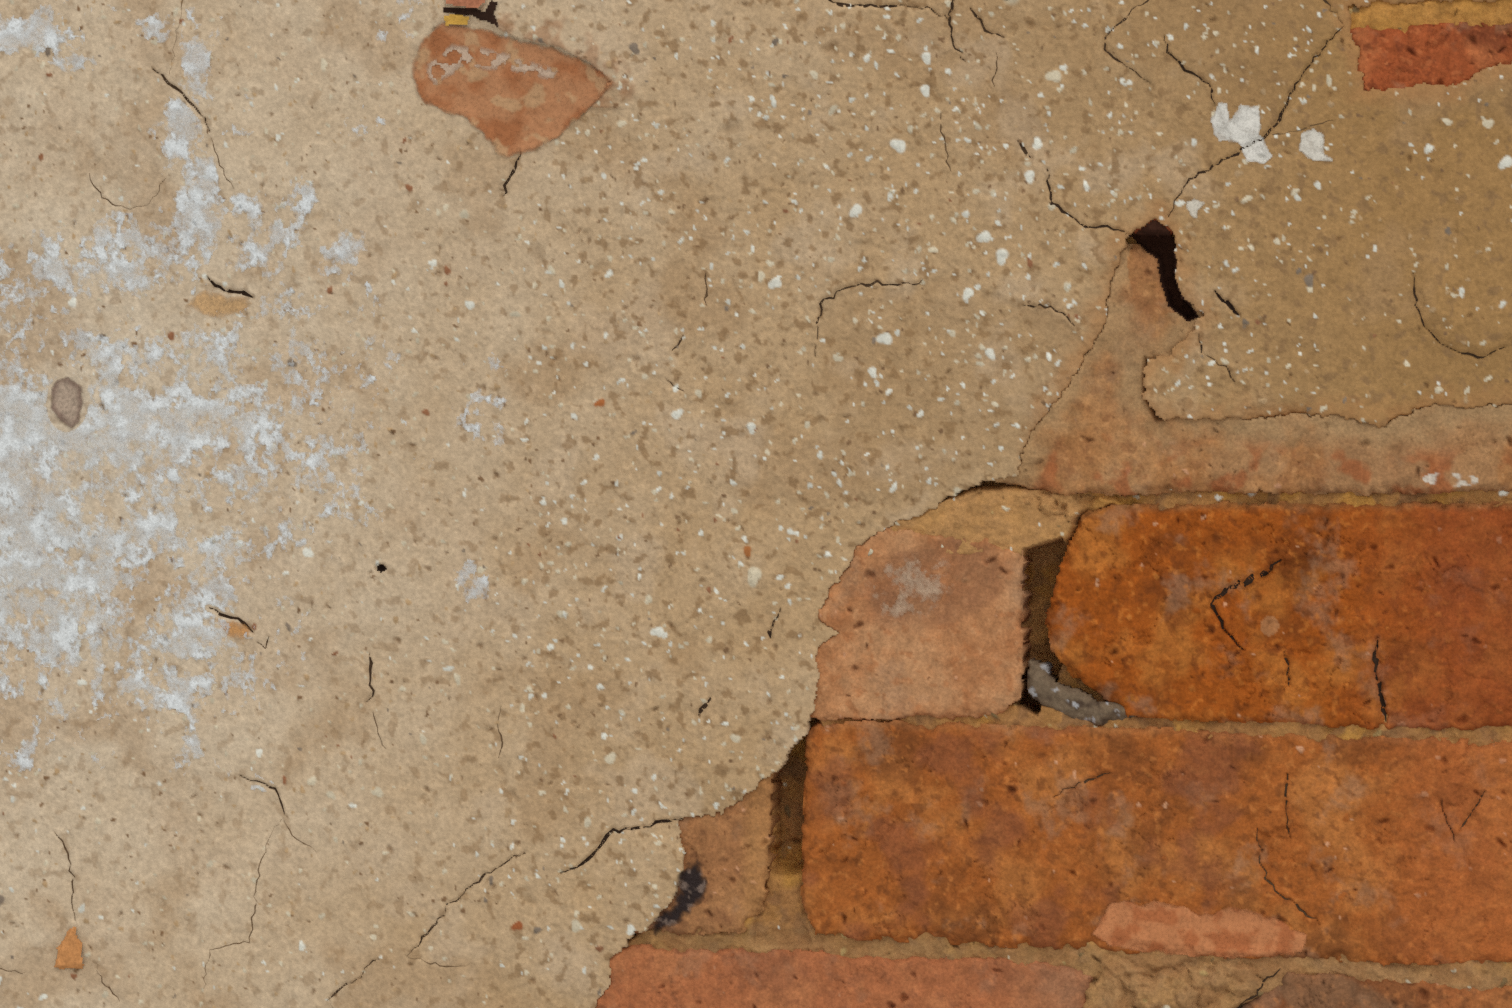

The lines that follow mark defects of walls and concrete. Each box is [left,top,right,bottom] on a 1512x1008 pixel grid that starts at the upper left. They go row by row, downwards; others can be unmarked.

spalling [413,0,613,156]
crack [829,0,1002,87]
crack [1104,0,1214,102]
crack [1168,0,1343,217]
crack [1017,140,1125,232]
crack [814,280,921,351]
crack [1215,291,1239,315]
flaking render [885,562,939,615]
crack [203,775,311,985]
crack [560,818,682,873]
crack [327,853,524,1006]
spalling [1093,900,1307,959]